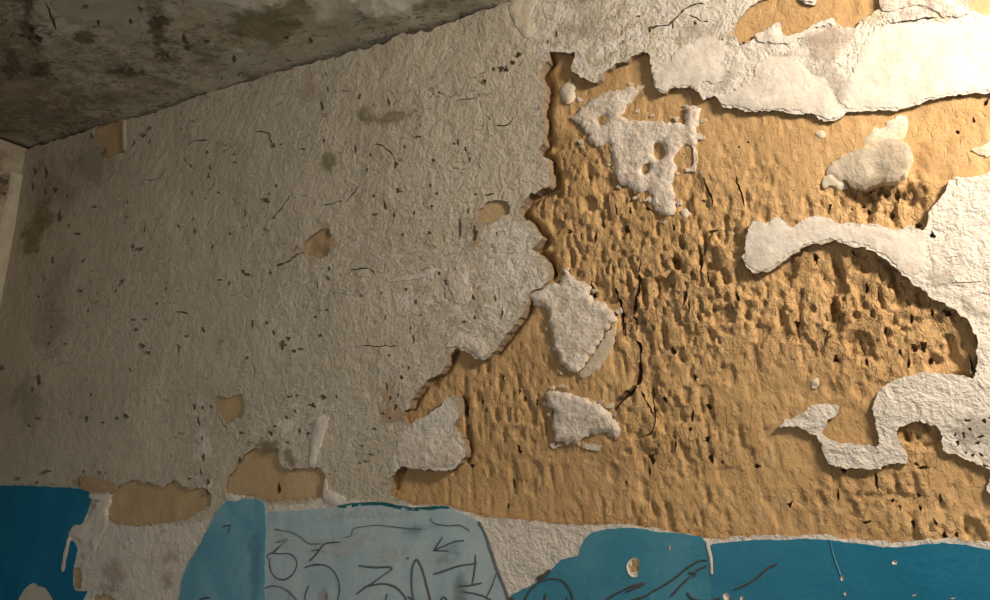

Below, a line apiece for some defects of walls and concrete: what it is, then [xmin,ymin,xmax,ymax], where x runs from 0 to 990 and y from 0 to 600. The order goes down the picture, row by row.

water stain [147,16,170,60]
water stain [231,0,311,45]
spalling [734,0,880,45]
spalling [968,0,990,16]
spalling [89,119,152,158]
spalling [303,229,332,289]
spalling [394,51,990,543]
crack [590,260,657,437]
spalling [192,394,245,441]
spalling [227,441,326,502]
spalling [61,453,212,589]